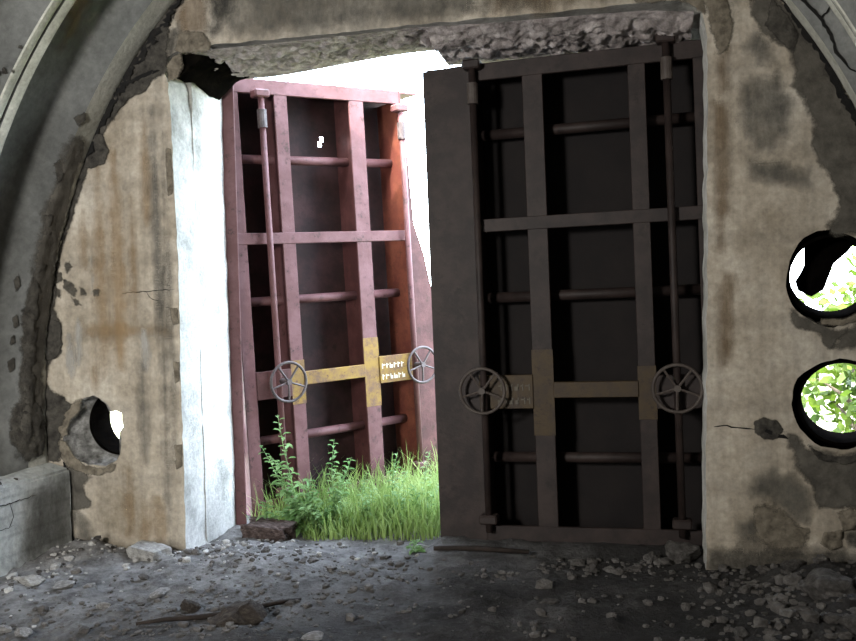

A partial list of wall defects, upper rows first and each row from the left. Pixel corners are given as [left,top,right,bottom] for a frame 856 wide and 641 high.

crack [781,0,856,126]
damp [744,77,788,146]
damp [753,163,802,182]
spalling [7,0,734,476]
crack [715,425,788,439]
damp [709,522,853,570]